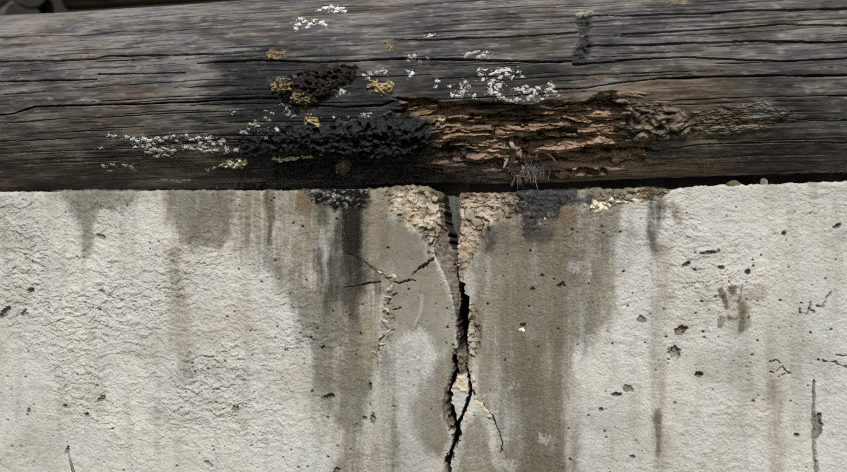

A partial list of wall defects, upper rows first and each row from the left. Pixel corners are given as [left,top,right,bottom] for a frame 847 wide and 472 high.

water stain [62,189,133,251]
spalling [385,184,524,281]
water stain [649,186,681,248]
water stain [165,187,457,472]
crack [424,192,503,472]
water stain [458,187,639,472]
crack [811,381,825,472]